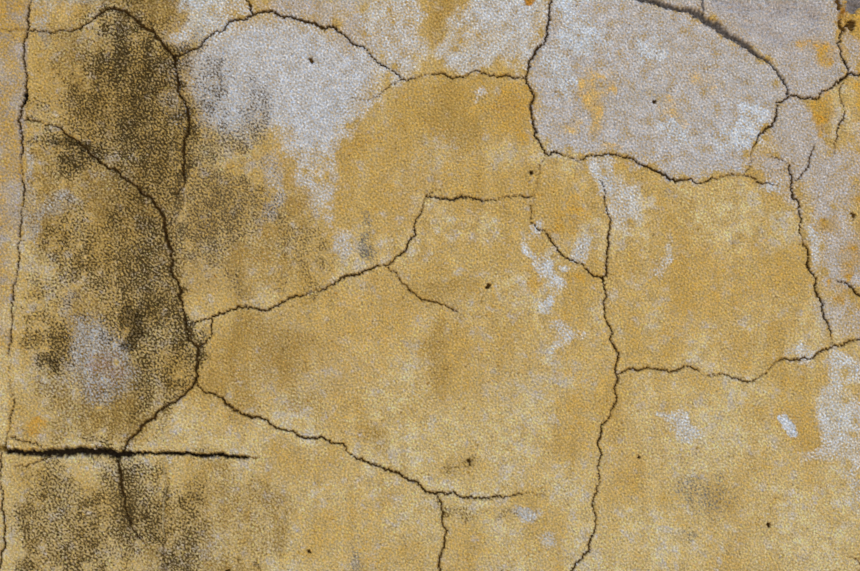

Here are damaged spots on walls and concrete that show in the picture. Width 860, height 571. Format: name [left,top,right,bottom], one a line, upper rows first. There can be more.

crack [0,0,174,94]
leakage [422,0,463,45]
leakage [414,72,484,156]
leakage [0,0,380,571]
crack [0,101,549,571]
leakage [385,264,479,403]
crack [172,0,860,571]
leakage [351,418,391,456]